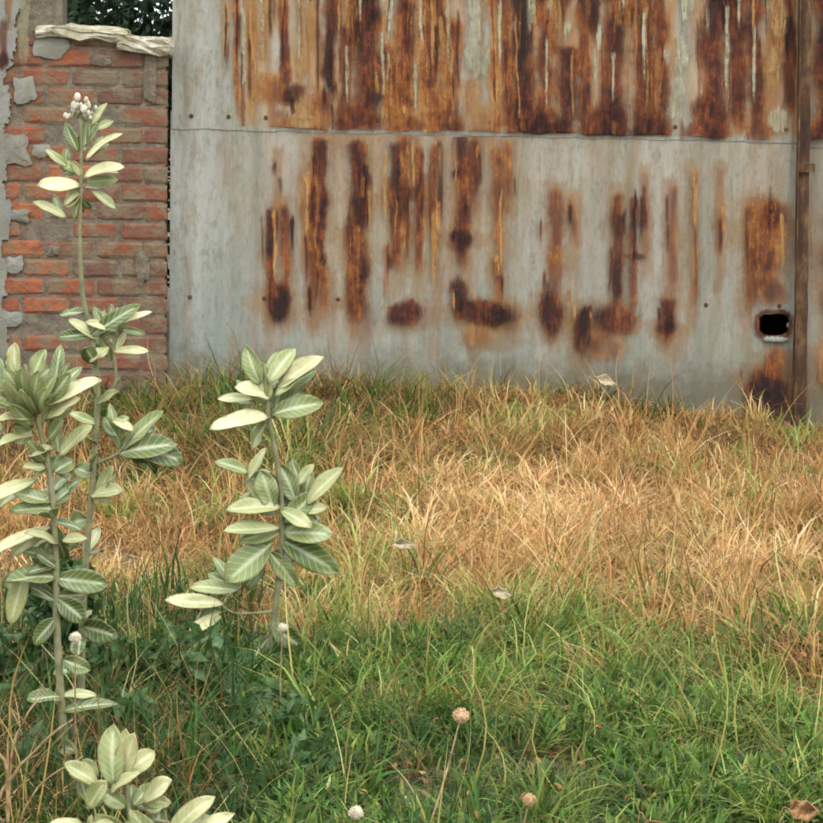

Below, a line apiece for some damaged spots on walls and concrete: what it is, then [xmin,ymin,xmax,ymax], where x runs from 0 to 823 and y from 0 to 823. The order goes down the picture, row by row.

corrosion [681,0,796,141]
spalling [0,37,169,399]
corrosion [224,0,676,327]
corrosion [539,186,647,358]
corrosion [656,298,676,343]
corrosion [665,187,678,282]
corrosion [740,348,791,419]
corrosion [745,194,794,338]